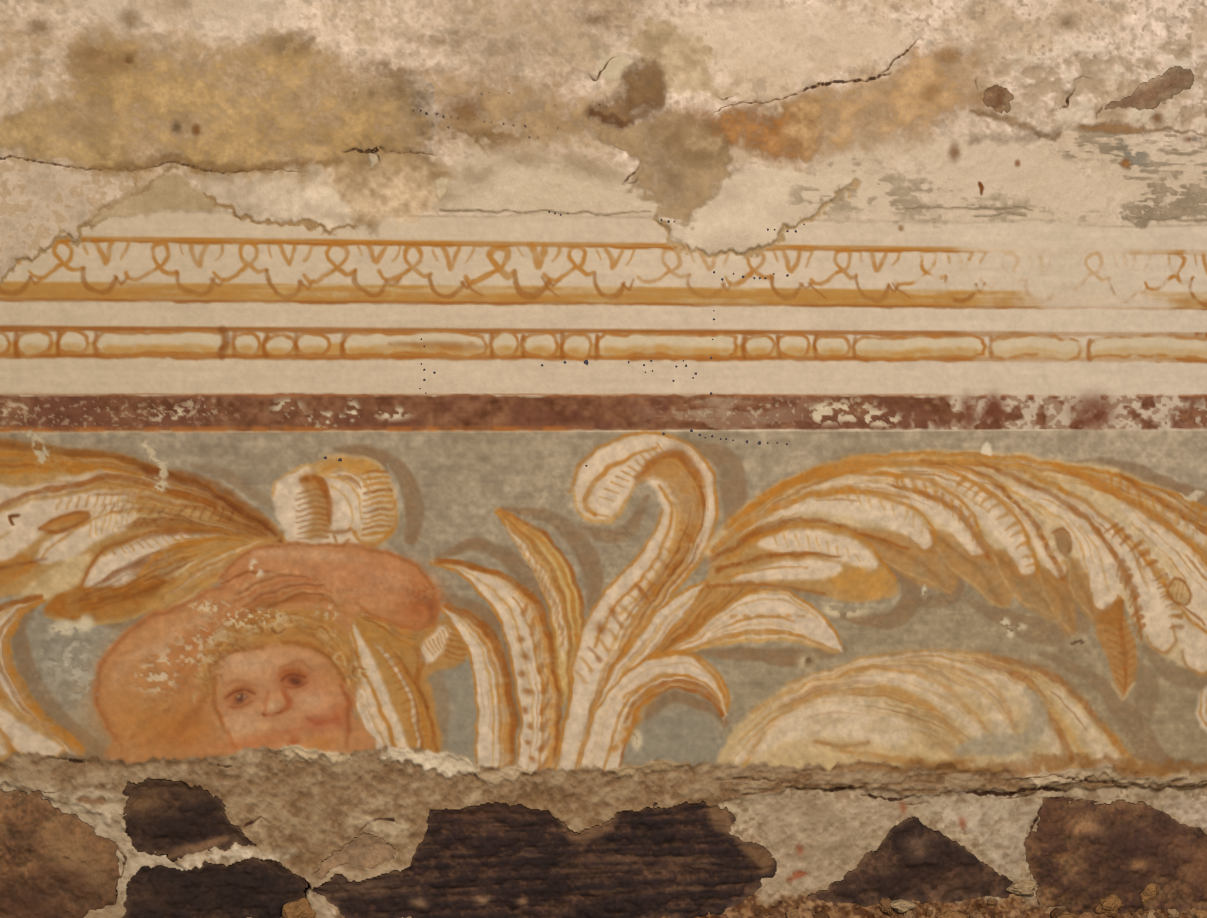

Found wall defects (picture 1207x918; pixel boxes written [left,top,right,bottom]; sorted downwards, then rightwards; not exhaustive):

crack [718,42,915,112]
crack [0,155,300,174]
spalling [0,134,496,286]
leakage [0,37,732,225]
crack [346,146,432,158]
peeling [1066,130,1207,227]
peeling [1,400,217,465]
peeling [272,399,360,429]
peeling [376,408,411,421]
peeling [748,399,903,428]
spalling [0,730,1207,895]
crack [725,774,1127,835]